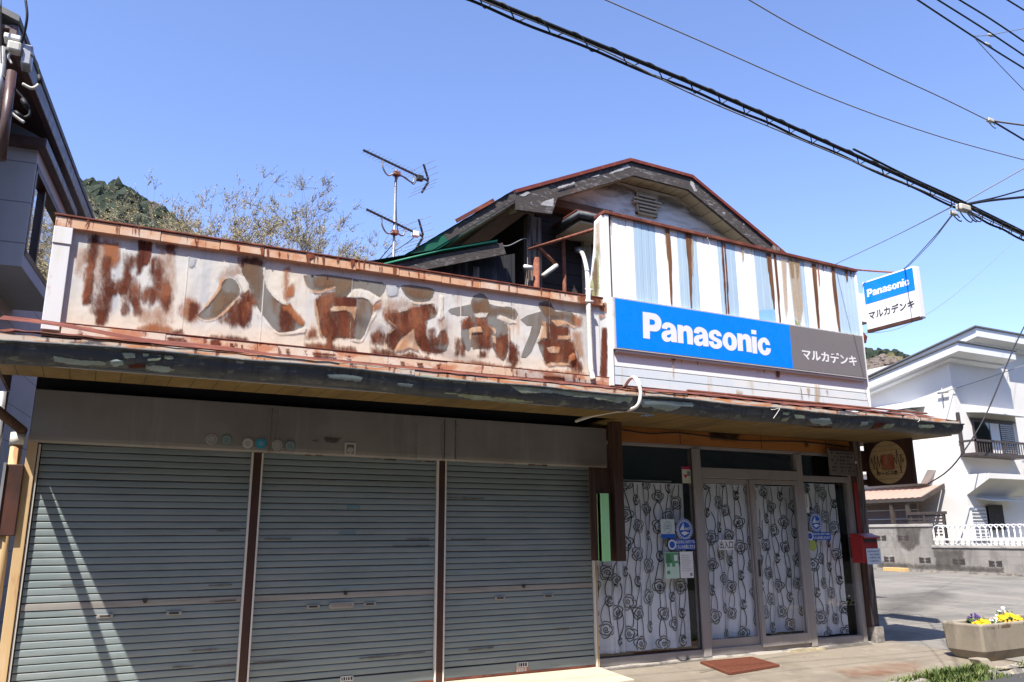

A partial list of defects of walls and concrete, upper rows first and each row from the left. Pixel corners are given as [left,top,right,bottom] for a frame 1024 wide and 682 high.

peeling [53,356,106,366]
rust [78,219,198,342]
peeling [122,353,175,373]
rust [210,290,256,348]
rust [237,244,357,358]
peeling [328,374,363,382]
rust [371,303,518,368]
rust [540,315,584,381]
rust [685,233,693,309]
rust [721,242,729,314]
rust [766,253,852,332]
peeling [781,412,832,426]